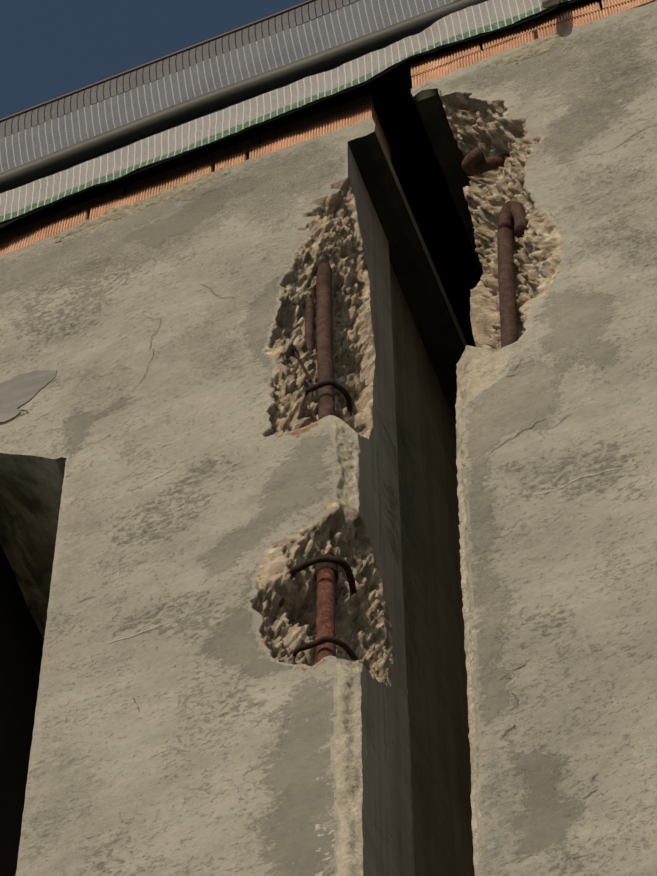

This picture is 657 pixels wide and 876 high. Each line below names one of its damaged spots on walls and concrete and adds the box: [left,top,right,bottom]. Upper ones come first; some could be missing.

spalling [250,177,394,876]
spalling [437,88,565,876]